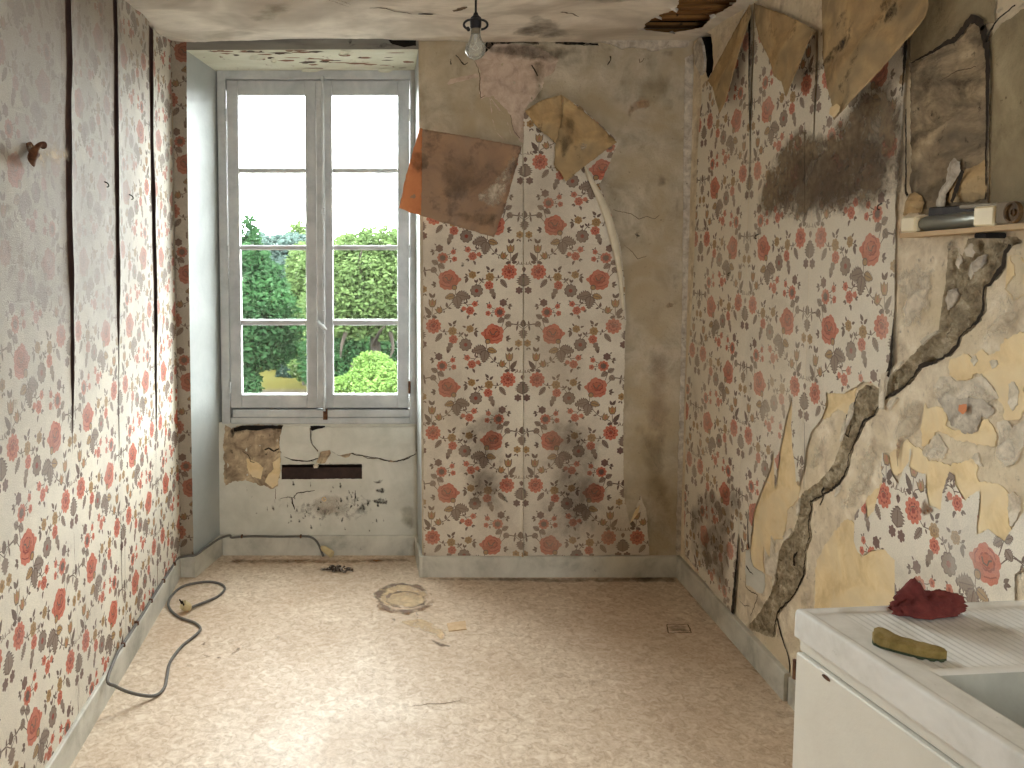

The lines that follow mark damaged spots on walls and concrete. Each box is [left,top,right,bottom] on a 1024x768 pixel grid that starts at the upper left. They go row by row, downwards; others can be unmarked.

flaking render [447,42,558,143]
leakage [760,83,903,216]
flaking render [909,23,990,215]
crack [275,489,315,510]
spalling [223,424,416,489]
crack [279,428,415,462]
crack [731,236,1022,673]
peeling [878,371,888,409]
peeling [934,355,1024,467]
peeling [745,536,779,594]